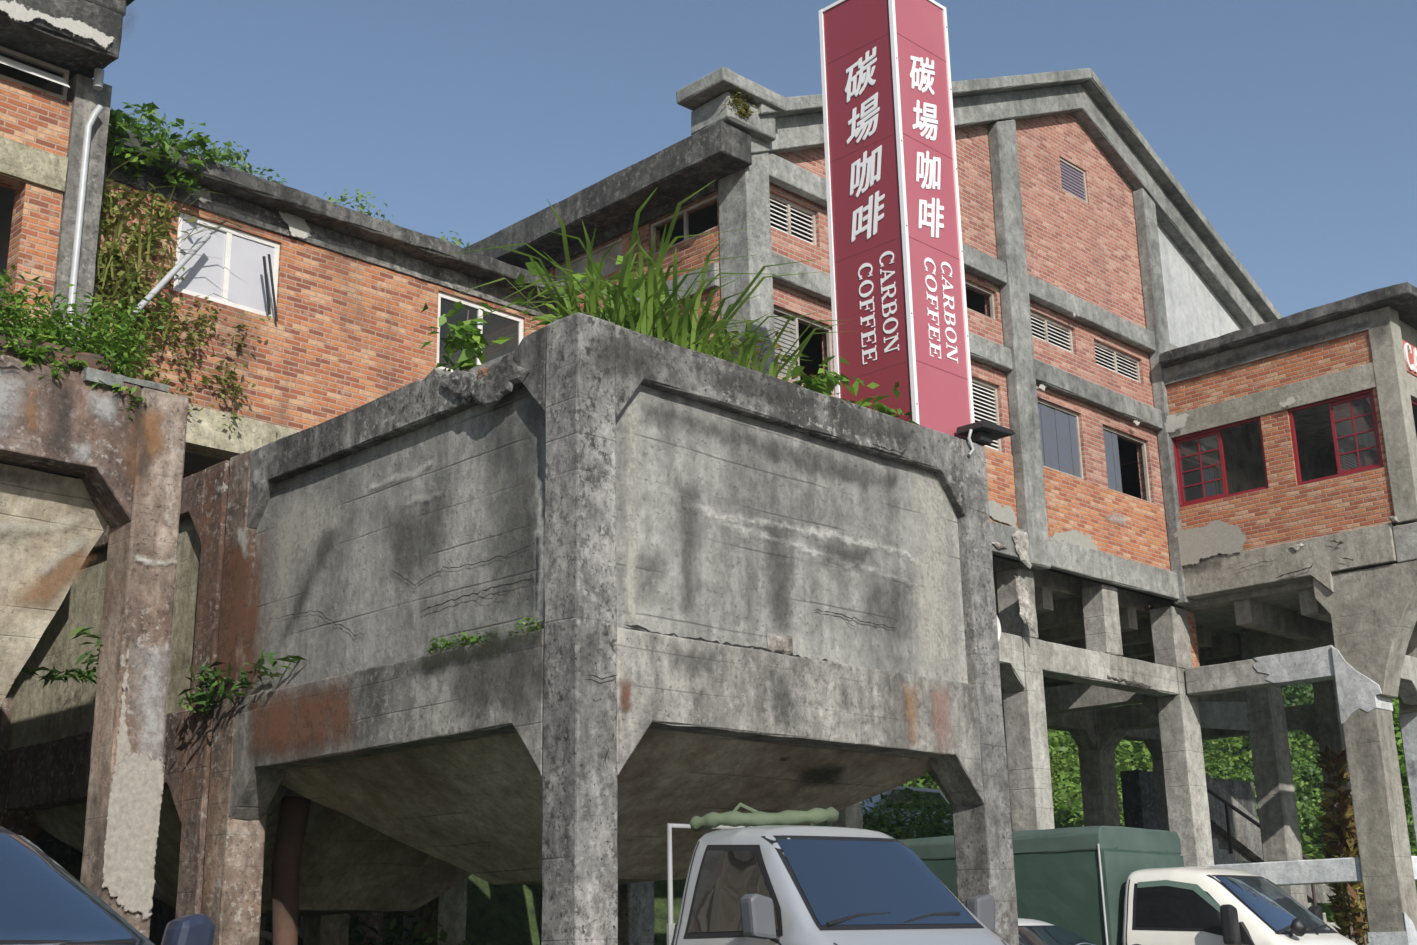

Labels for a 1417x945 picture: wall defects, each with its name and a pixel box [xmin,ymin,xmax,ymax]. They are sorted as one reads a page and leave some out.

peeling [0,0,114,47]
rust [23,553,85,601]
spalling [102,649,165,919]